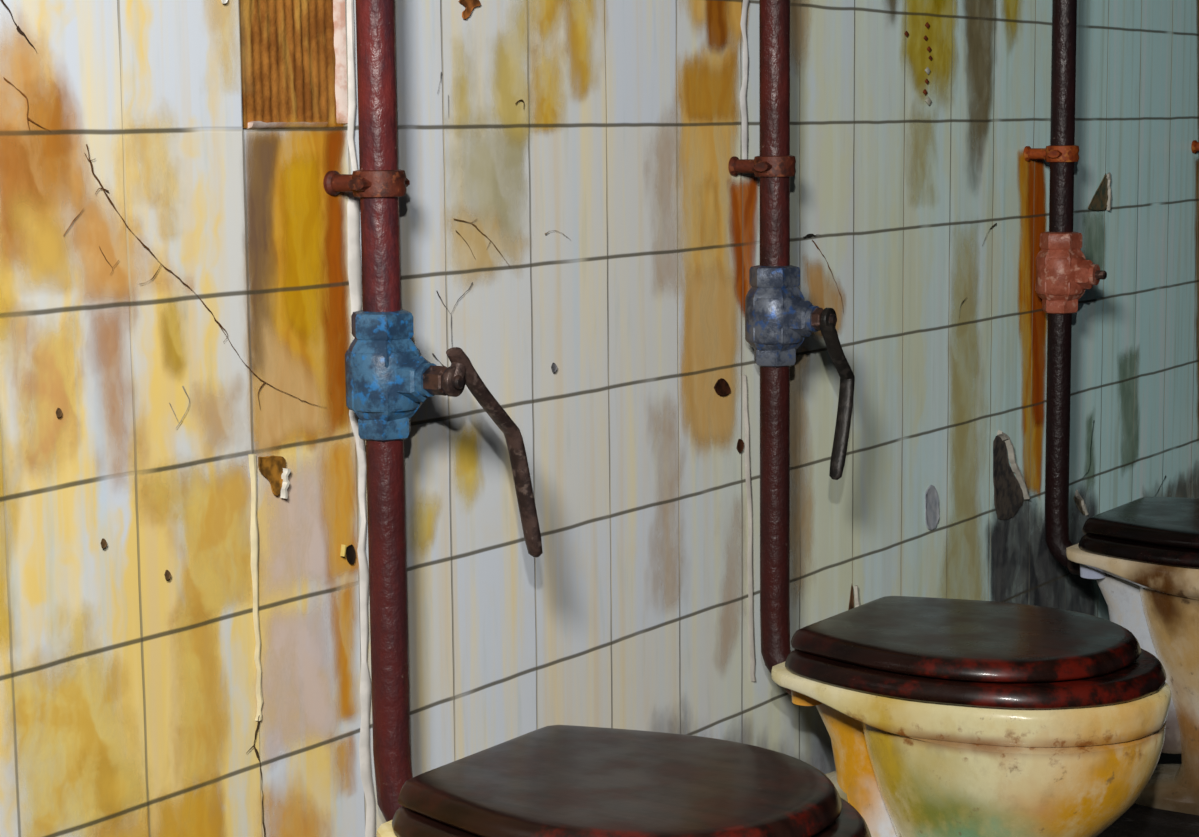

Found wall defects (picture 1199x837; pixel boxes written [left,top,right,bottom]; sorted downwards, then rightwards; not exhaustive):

crack [3,77,50,131]
water stain [29,328,69,467]
water stain [0,37,136,298]
crack [63,144,326,408]
spalling [258,455,291,499]
spalling [458,0,481,19]
corrosion [678,0,757,441]
peeling [993,430,1030,520]
water stain [944,245,1096,616]
corrosion [1019,153,1047,495]
spalling [1088,172,1112,211]
water stain [9,468,251,837]